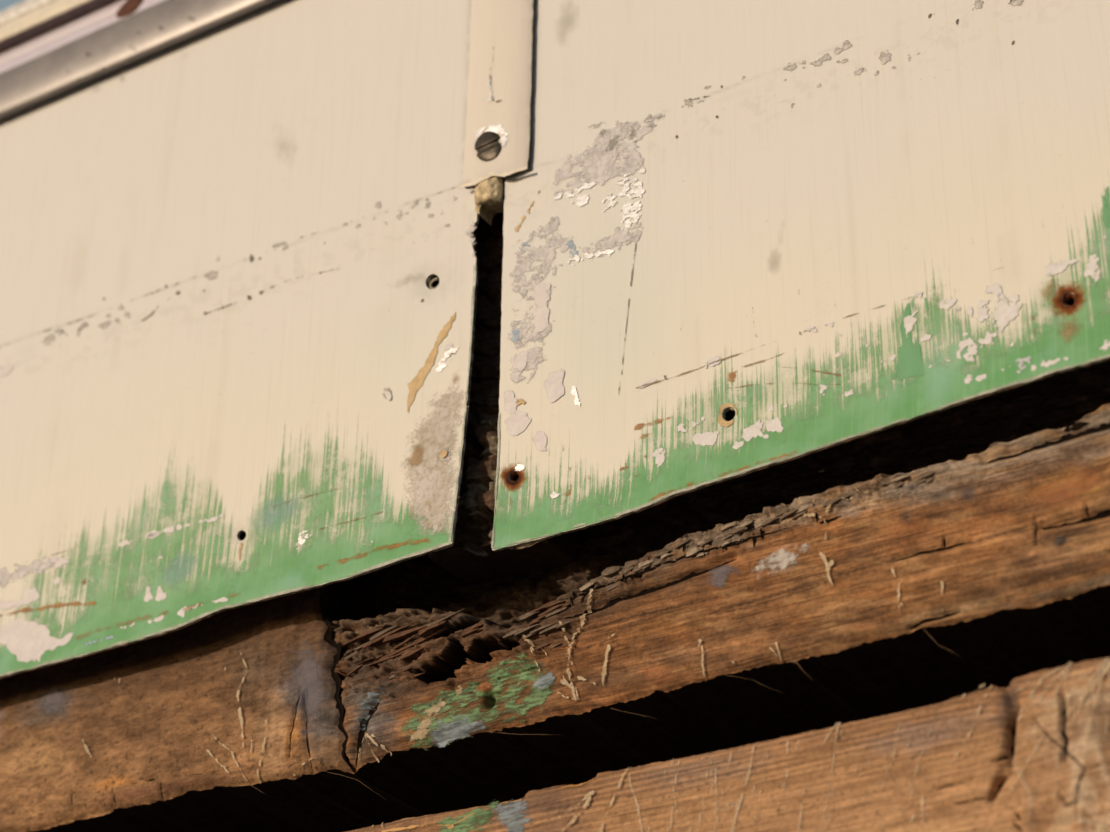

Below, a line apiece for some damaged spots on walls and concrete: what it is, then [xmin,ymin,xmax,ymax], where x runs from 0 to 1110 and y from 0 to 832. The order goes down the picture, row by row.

peeling [783,40,895,81]
peeling [491,114,1110,549]
rust [1045,285,1084,337]
peeling [0,265,475,676]
damp [410,446,422,465]
rust [500,464,525,490]
crack [896,538,974,561]
crack [1035,504,1110,545]
crack [911,611,960,629]
crack [289,695,313,771]
crack [355,702,380,767]
crack [939,698,1110,815]